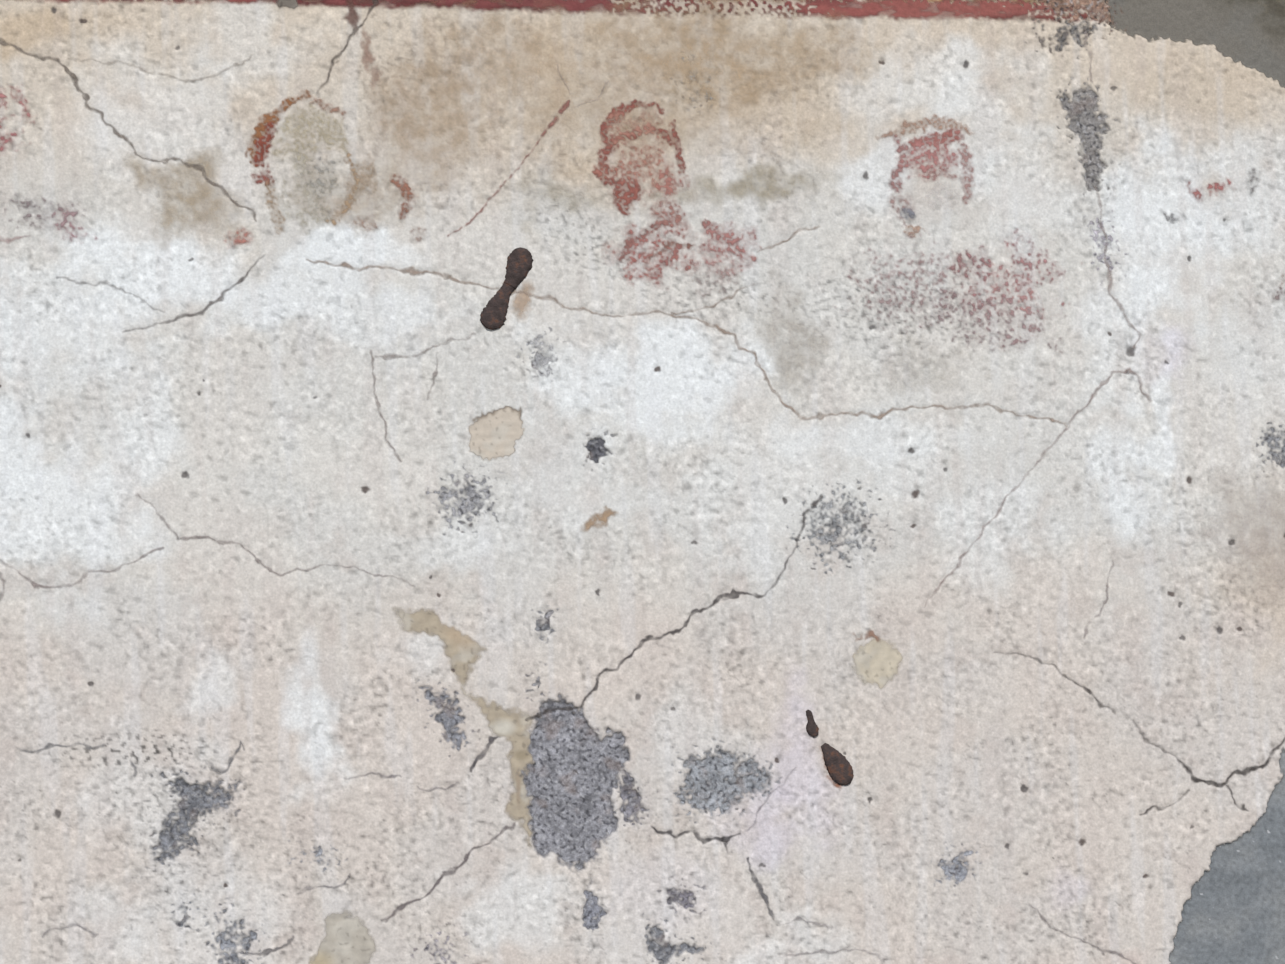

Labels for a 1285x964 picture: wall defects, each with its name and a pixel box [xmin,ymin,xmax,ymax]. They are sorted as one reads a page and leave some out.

spalling [1036,0,1122,53]
crack [0,41,255,218]
spalling [1057,82,1118,191]
crack [167,271,249,323]
crack [531,561,787,718]
spalling [419,686,474,756]
spalling [151,770,245,864]
spalling [521,674,647,870]
spalling [675,745,779,823]
crack [1179,739,1285,810]
crack [387,823,515,919]
crack [653,827,800,919]